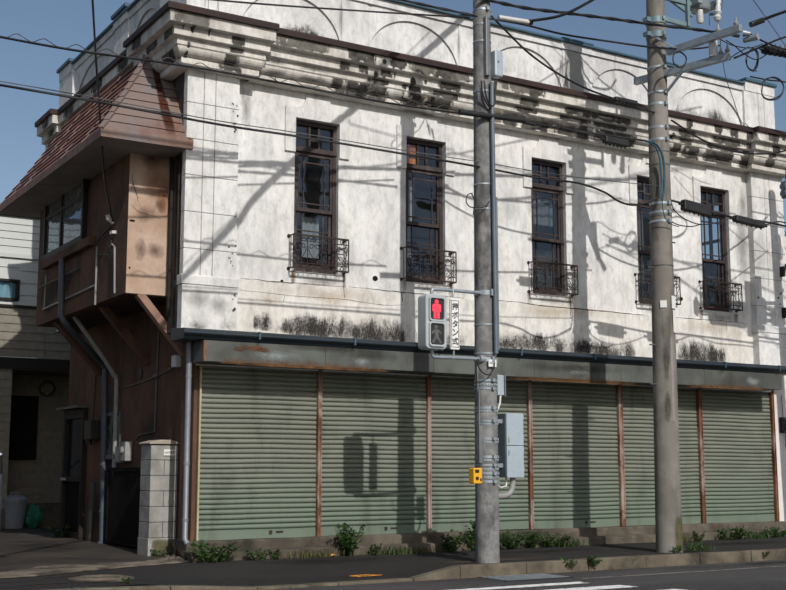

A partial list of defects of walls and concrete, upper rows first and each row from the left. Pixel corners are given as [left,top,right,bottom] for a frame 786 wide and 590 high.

peeling [330,49,469,115]
peeling [494,81,637,147]
peeling [670,120,753,169]
peeling [764,134,785,167]
leakage [281,316,405,350]
leakage [499,335,635,356]
leakage [679,343,725,362]